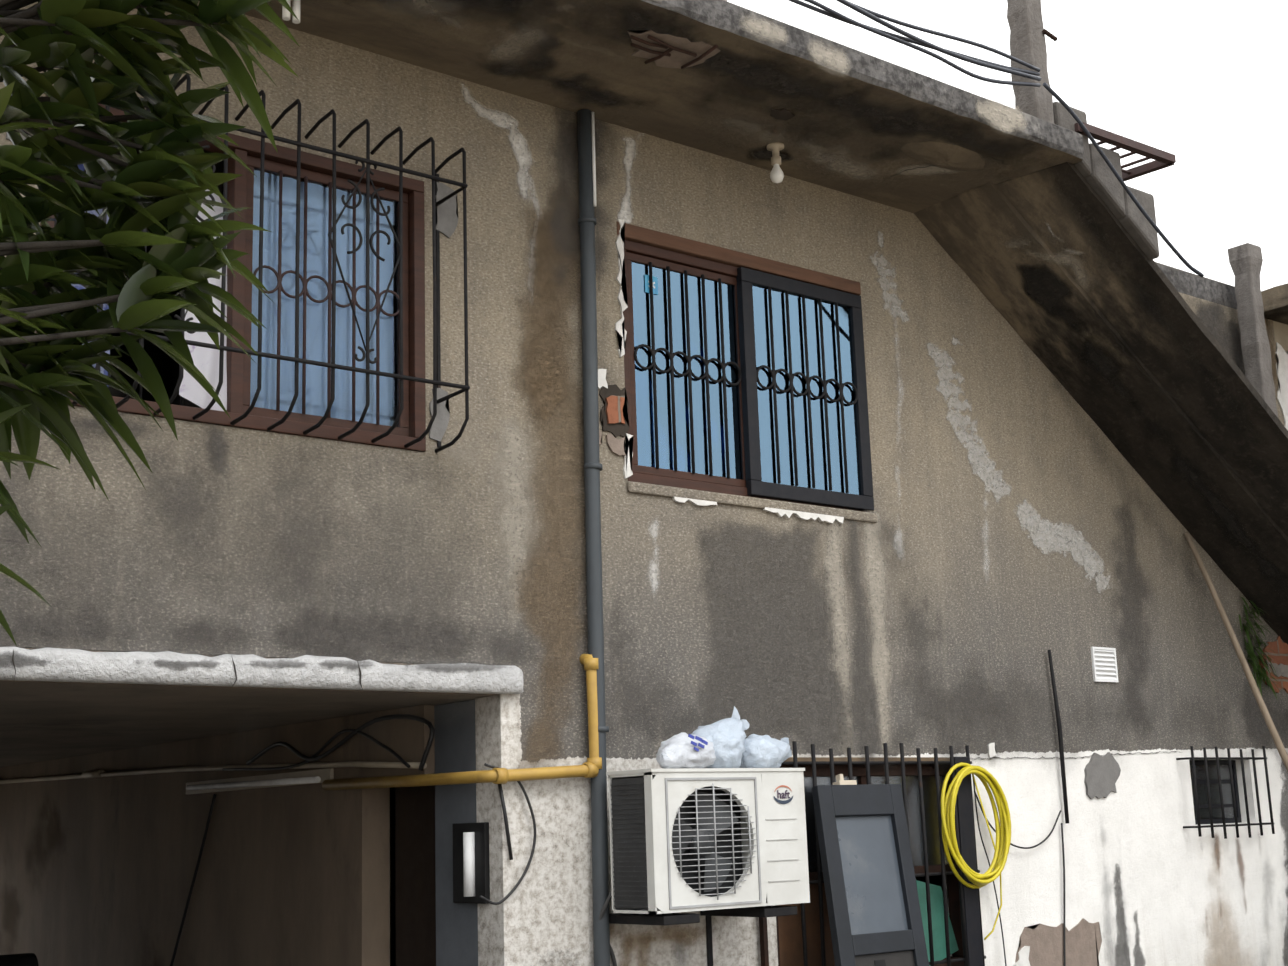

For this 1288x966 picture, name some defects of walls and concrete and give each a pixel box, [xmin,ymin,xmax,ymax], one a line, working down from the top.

water stain [594,138,635,223]
flaking render [615,219,628,357]
water stain [1018,251,1084,315]
water stain [463,88,583,762]
flaking render [598,369,634,479]
flaking render [928,339,1011,501]
flaking render [1275,343,1288,430]
flaking render [1018,500,1110,590]
water stain [280,614,467,660]
water stain [703,512,902,757]
peeling [1013,946,1030,966]
water stain [1115,865,1146,966]